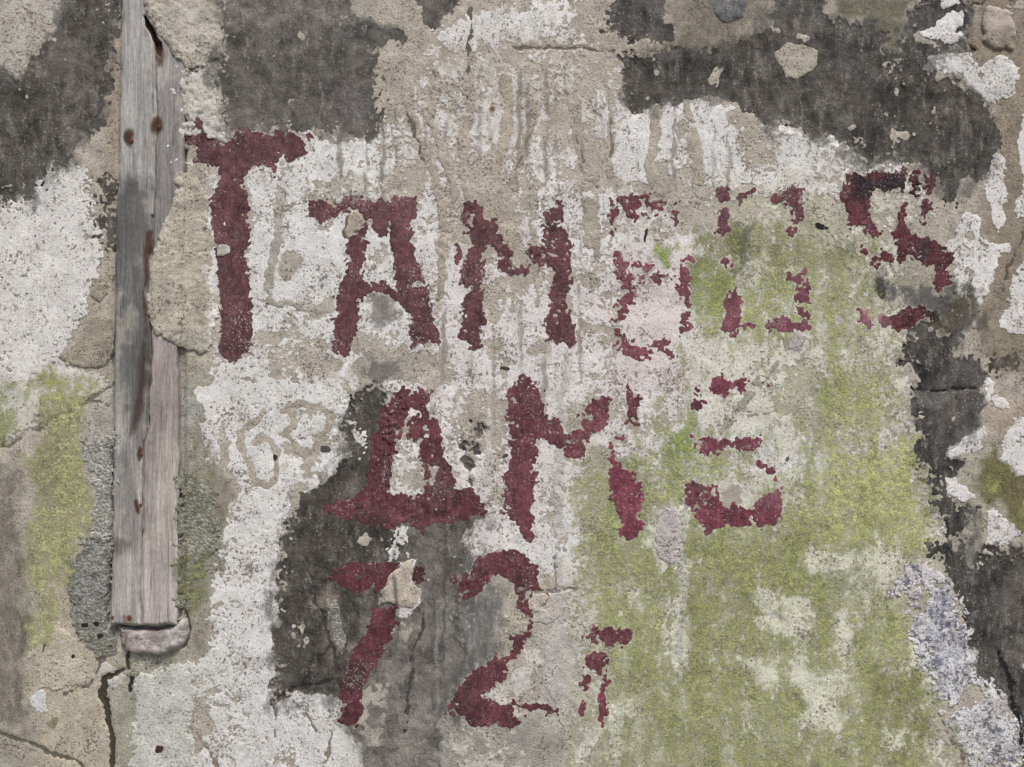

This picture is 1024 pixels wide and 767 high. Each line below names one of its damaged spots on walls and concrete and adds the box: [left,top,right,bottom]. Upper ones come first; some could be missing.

corrosion [123,130,133,145]
corrosion [151,117,162,134]
peeling [170,157,230,321]
peeling [481,253,507,286]
spalling [809,215,829,237]
peeling [290,407,326,449]
peeling [388,433,436,498]
crack [0,646,135,767]
peeling [448,719,530,767]
peeling [480,634,545,718]
peeling [569,699,639,766]
water stain [886,560,1024,767]